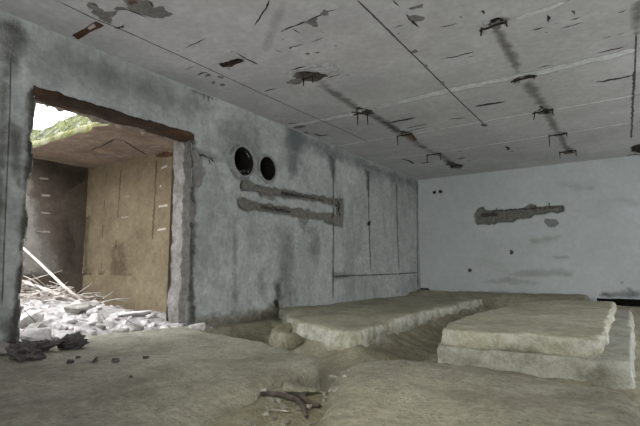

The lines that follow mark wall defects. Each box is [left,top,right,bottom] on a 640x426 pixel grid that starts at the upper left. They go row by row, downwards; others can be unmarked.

peeling [87,0,173,30]
spalling [482,10,506,30]
spalling [198,59,244,86]
spalling [286,65,340,85]